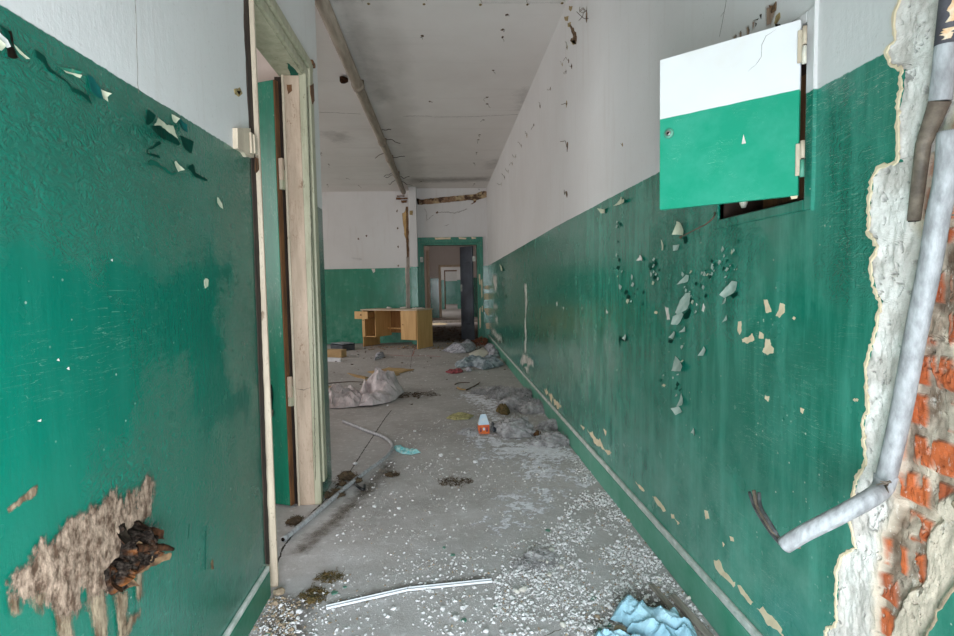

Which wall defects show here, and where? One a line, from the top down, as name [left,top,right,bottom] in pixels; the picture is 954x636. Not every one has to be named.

peeling [0,25,112,105]
peeling [146,109,208,181]
peeling [616,221,688,306]
flaking render [850,0,954,497]
peeling [654,239,774,415]
peeling [764,300,796,320]
peeling [581,425,611,455]
flaking render [823,206,954,636]
peeling [636,482,680,524]
spalling [104,520,165,596]
peeling [714,559,784,636]